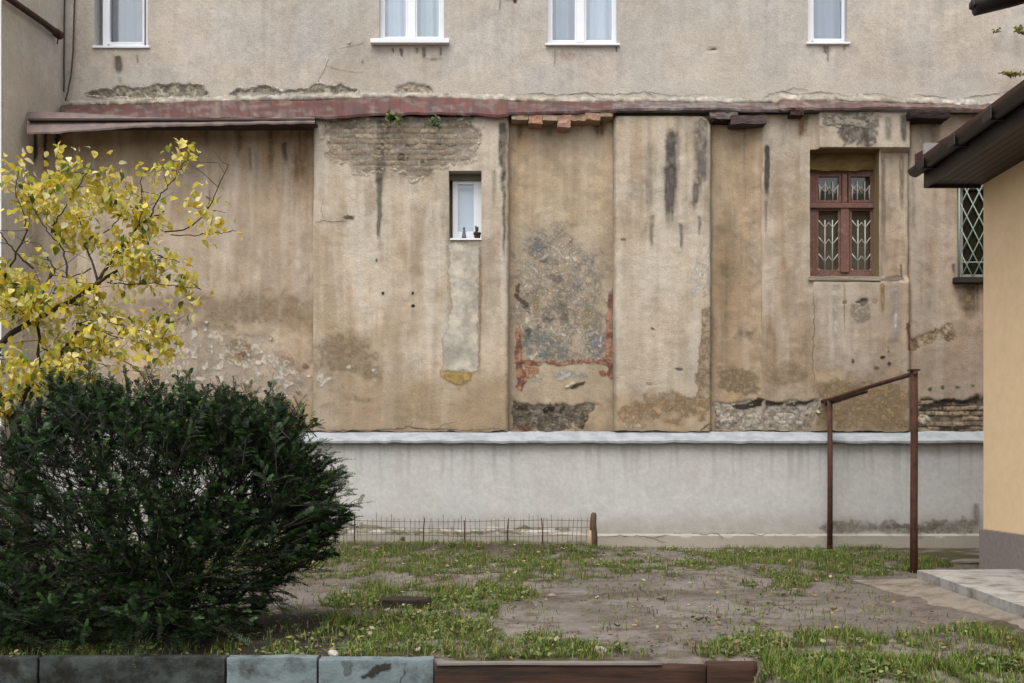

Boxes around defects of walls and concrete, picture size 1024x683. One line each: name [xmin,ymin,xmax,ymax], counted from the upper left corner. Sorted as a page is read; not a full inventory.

flaking render [85,81,209,100]
flaking render [228,82,359,96]
flaking render [320,117,483,183]
water stain [665,131,683,246]
water stain [692,118,708,230]
flaking render [820,112,874,131]
flaking render [155,321,331,398]
peeling [511,226,613,431]
flaking render [692,252,821,431]
flaking render [906,322,955,351]
flaking render [918,395,983,431]
water stain [821,504,978,537]